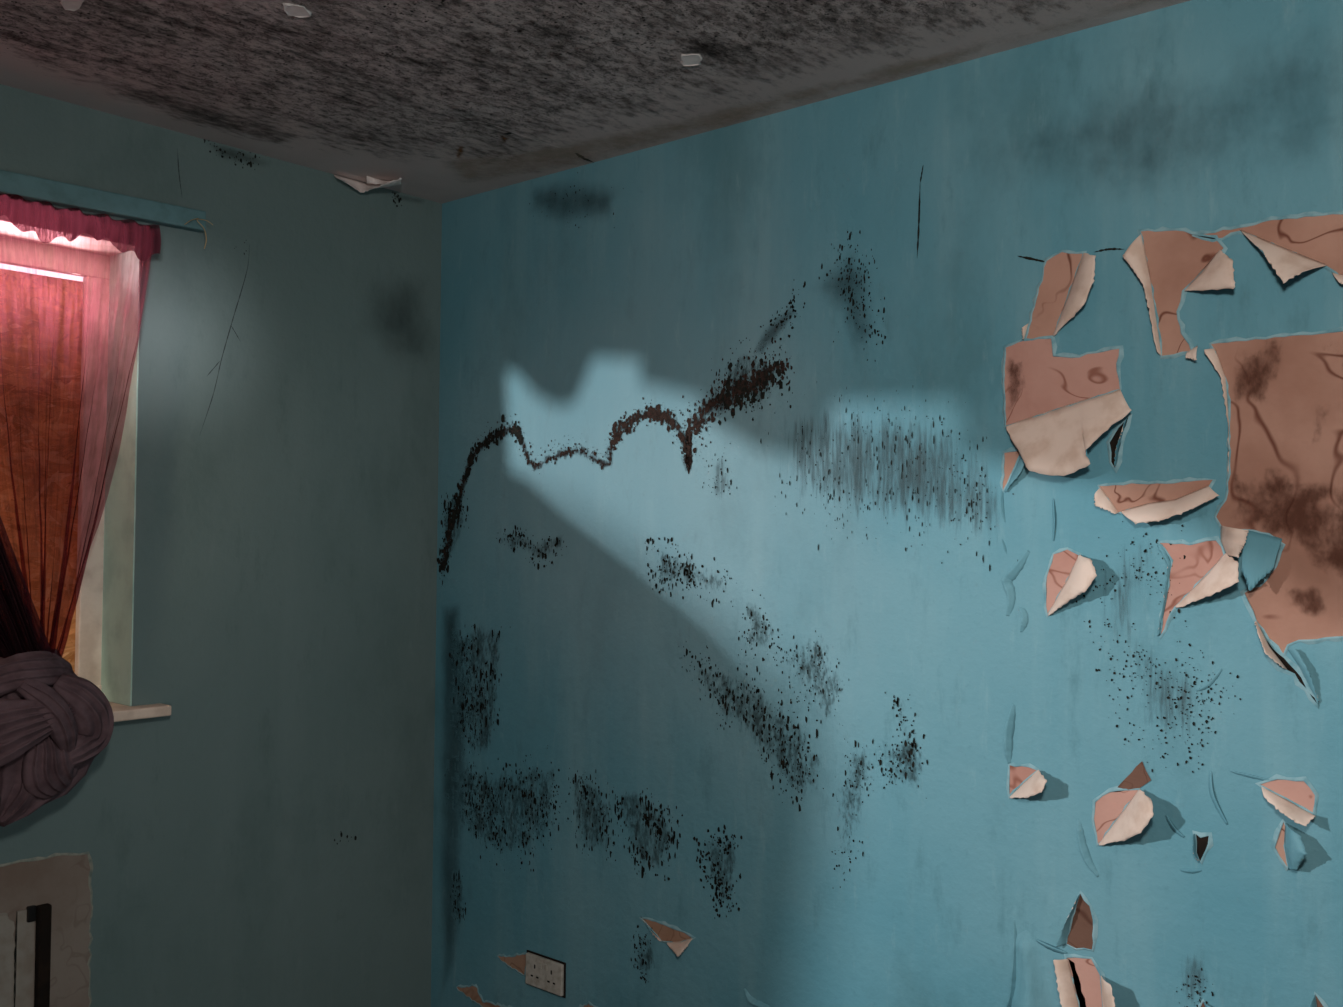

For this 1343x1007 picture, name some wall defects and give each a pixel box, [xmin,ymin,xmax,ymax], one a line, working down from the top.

water stain [0,0,953,157]
water stain [437,231,886,585]
water stain [775,387,991,571]
peeling [999,210,1343,709]
water stain [449,624,742,921]
water stain [645,537,928,888]
peeling [1006,762,1047,799]
peeling [1091,762,1154,846]
water stain [1084,619,1241,773]
peeling [1255,774,1319,871]
peeling [639,917,696,957]
peeling [1053,890,1115,1007]